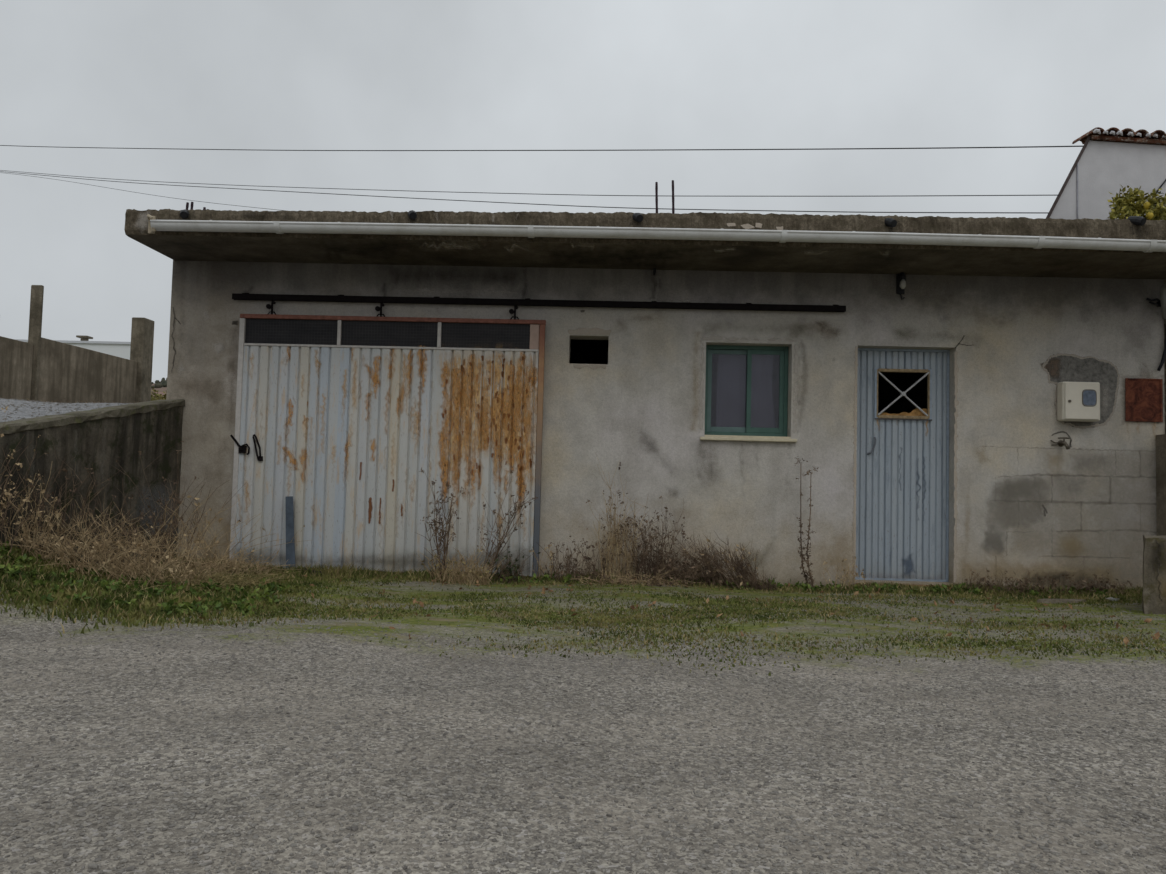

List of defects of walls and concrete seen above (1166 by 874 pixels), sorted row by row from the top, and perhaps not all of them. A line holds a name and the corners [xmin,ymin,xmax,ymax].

rust [366,346,426,414]
flaking render [1041,353,1120,429]
rust [439,353,536,510]
rust [368,479,394,524]